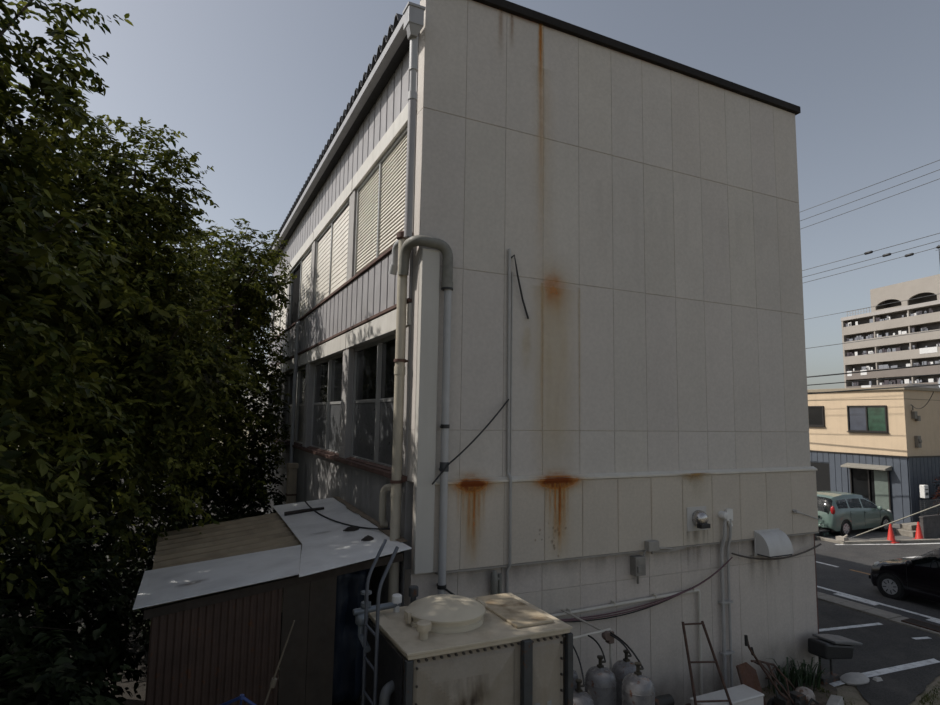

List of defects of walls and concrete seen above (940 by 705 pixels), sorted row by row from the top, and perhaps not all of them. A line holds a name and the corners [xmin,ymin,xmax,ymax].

corrosion [455,478,489,532]
corrosion [537,475,579,526]